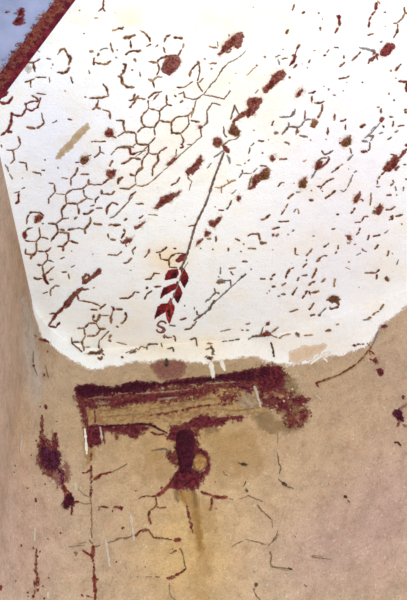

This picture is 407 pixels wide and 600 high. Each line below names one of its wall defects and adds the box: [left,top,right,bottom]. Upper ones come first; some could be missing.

rust [0,0,75,100]
crack [0,30,240,296]
crack [279,91,325,145]
crack [361,106,394,153]
crack [71,291,175,354]
rust [308,295,340,317]
rust [73,358,259,429]
spalling [251,343,327,429]
rust [392,395,407,427]
spalling [36,415,68,489]
rust [150,421,211,492]
crack [69,452,187,600]